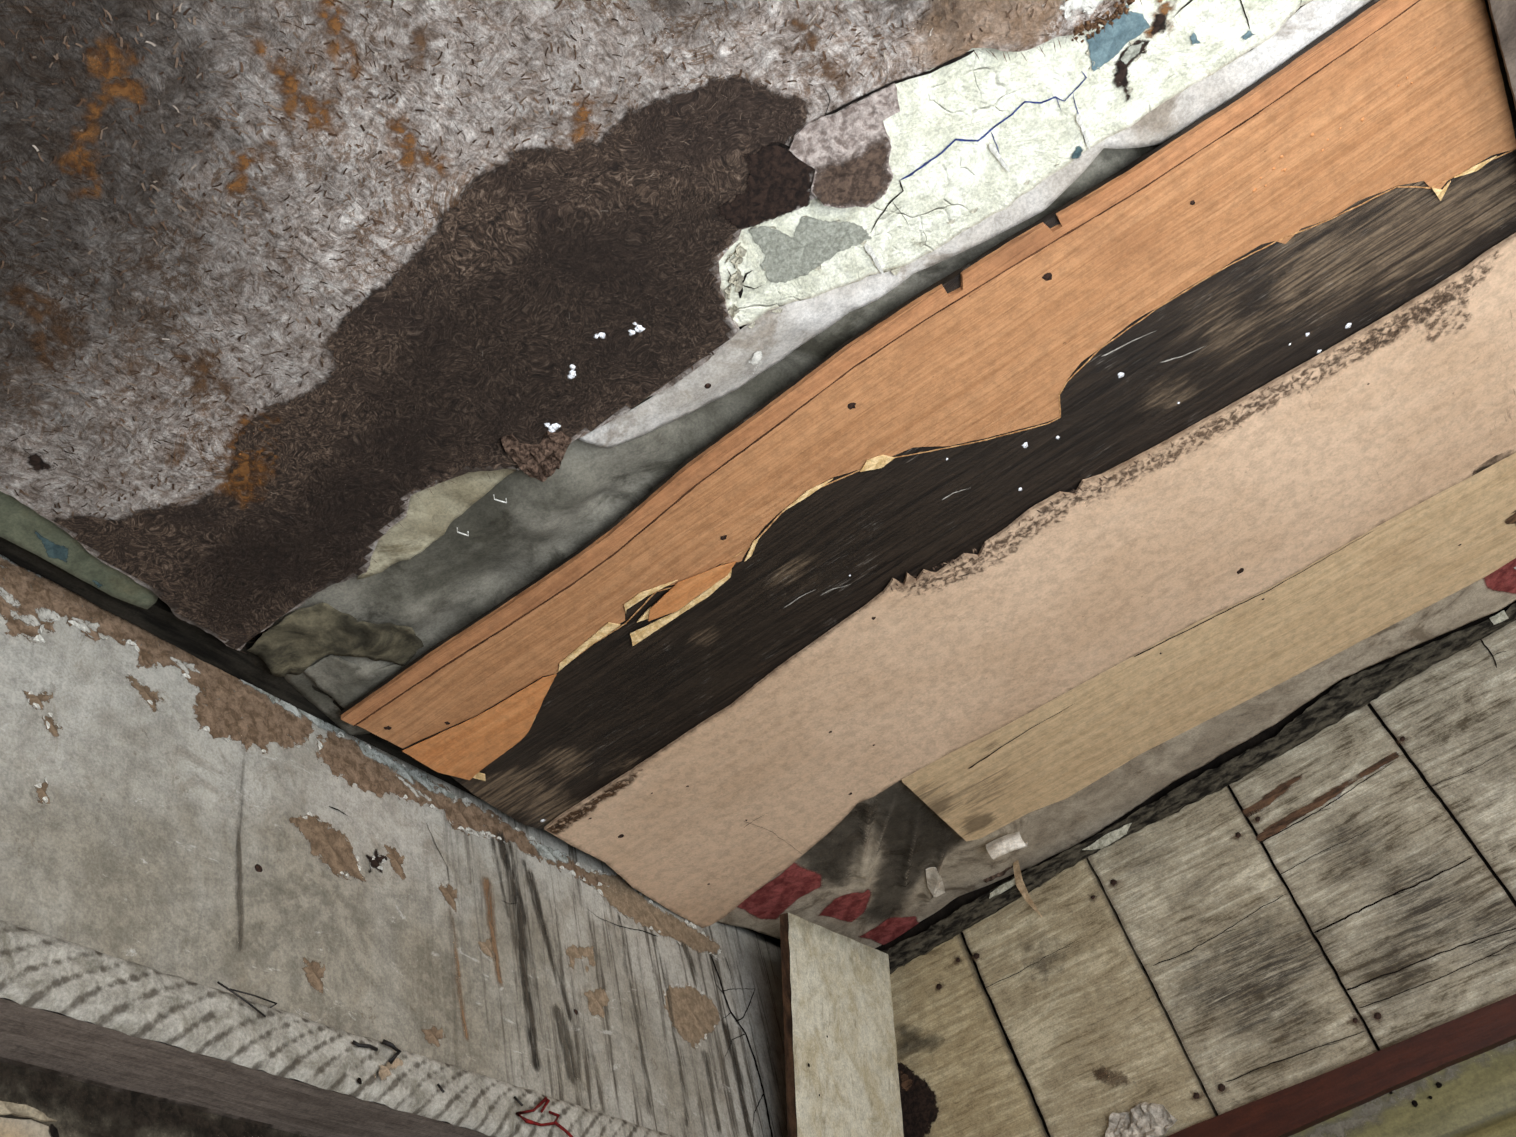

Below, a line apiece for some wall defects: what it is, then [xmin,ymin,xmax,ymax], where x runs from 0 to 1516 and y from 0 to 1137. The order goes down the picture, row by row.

crack [815,50,975,121]
rust [60,39,145,195]
crack [765,141,790,149]
peeling [719,0,1312,328]
crack [727,269,760,298]
damp [52,75,809,650]
peeling [35,531,68,563]
peeling [0,554,722,958]
peeling [303,958,326,994]
peeling [565,944,596,972]
peeling [584,987,610,1018]
peeling [421,1025,446,1047]